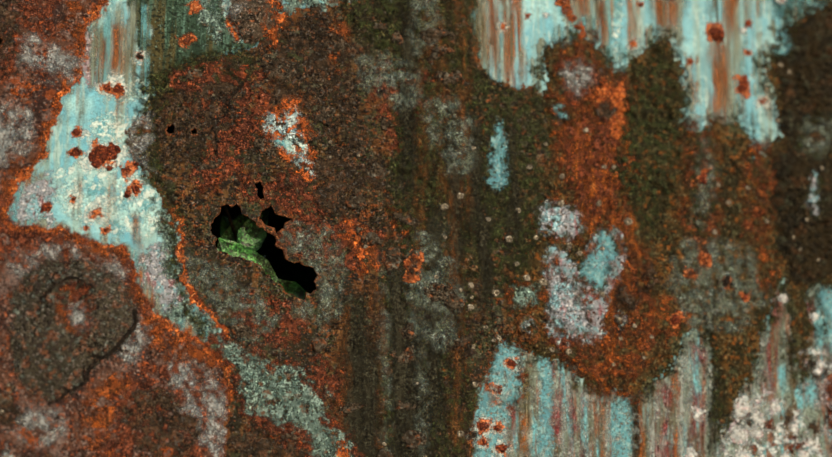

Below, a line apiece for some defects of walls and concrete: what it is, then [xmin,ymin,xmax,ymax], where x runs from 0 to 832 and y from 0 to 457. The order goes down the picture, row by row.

corrosion [656,0,677,30]
corrosion [0,0,665,457]
corrosion [683,251,712,280]
corrosion [668,311,685,329]
corrosion [757,292,783,387]
corrosion [648,345,713,457]